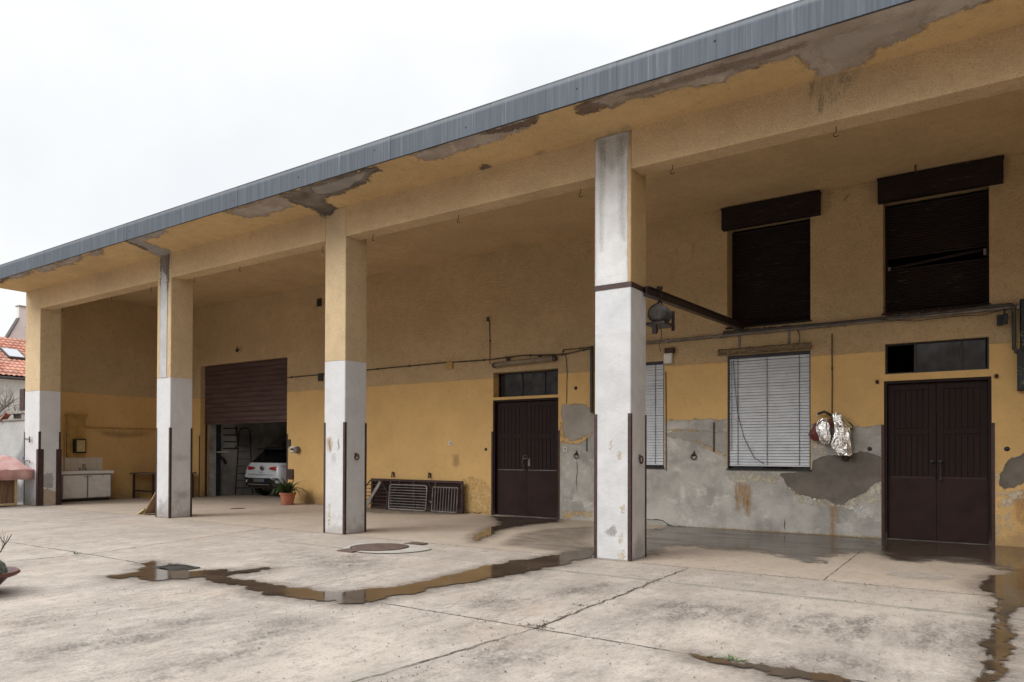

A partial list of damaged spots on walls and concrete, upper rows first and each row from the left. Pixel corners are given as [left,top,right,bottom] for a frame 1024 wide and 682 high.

peeling [588,0,993,109]
peeling [408,116,539,161]
flaking render [647,418,881,538]